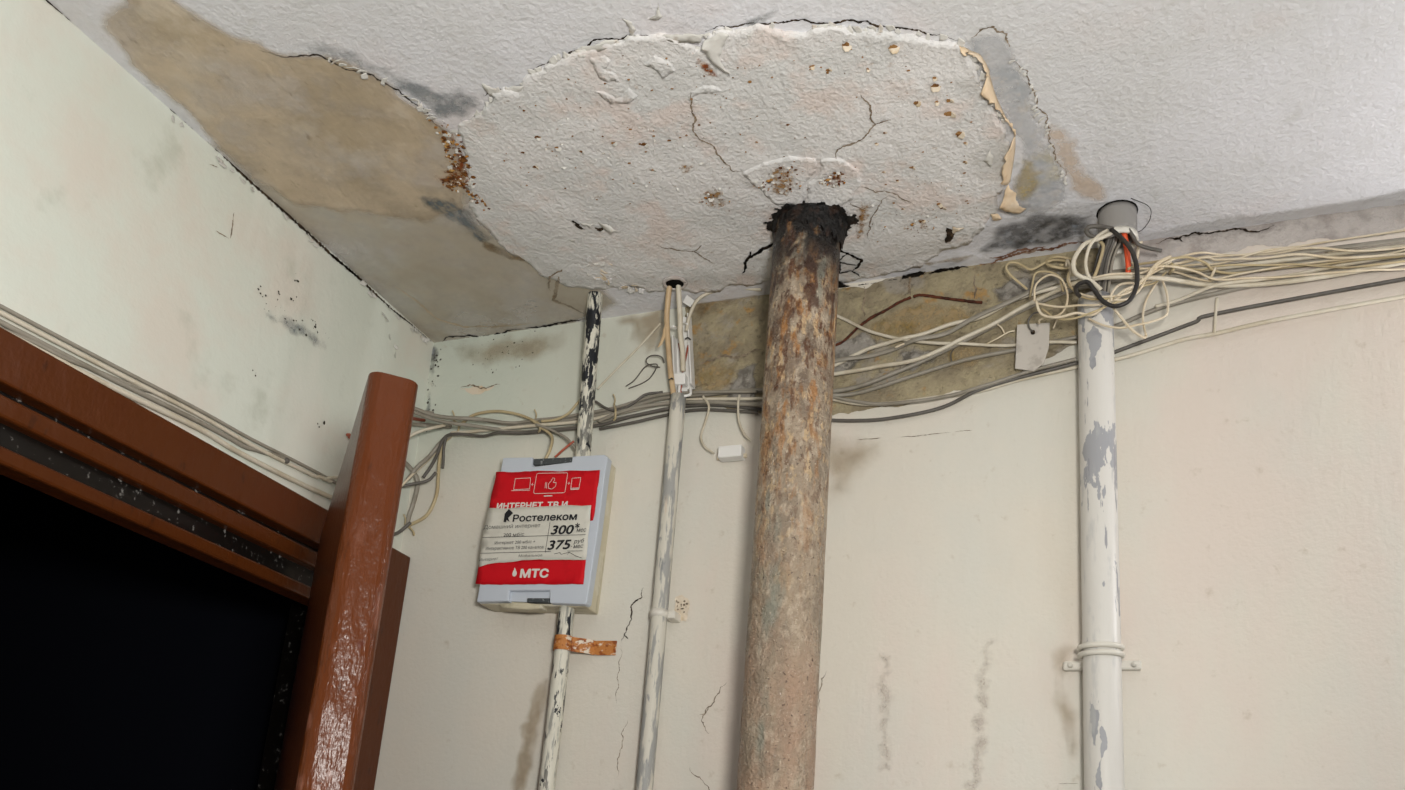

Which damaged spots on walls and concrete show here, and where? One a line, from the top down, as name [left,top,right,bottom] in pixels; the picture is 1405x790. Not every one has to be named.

peeling [577,5,705,105]
corrosion [428,119,492,211]
peeling [570,220,621,242]
crack [657,243,773,273]
crack [690,95,741,172]
corrosion [753,156,856,219]
crack [835,96,888,157]
corrosion [847,201,938,242]
peeling [913,46,1026,221]
damp [988,216,1085,249]
spalling [685,294,769,414]
spalling [832,226,1102,415]